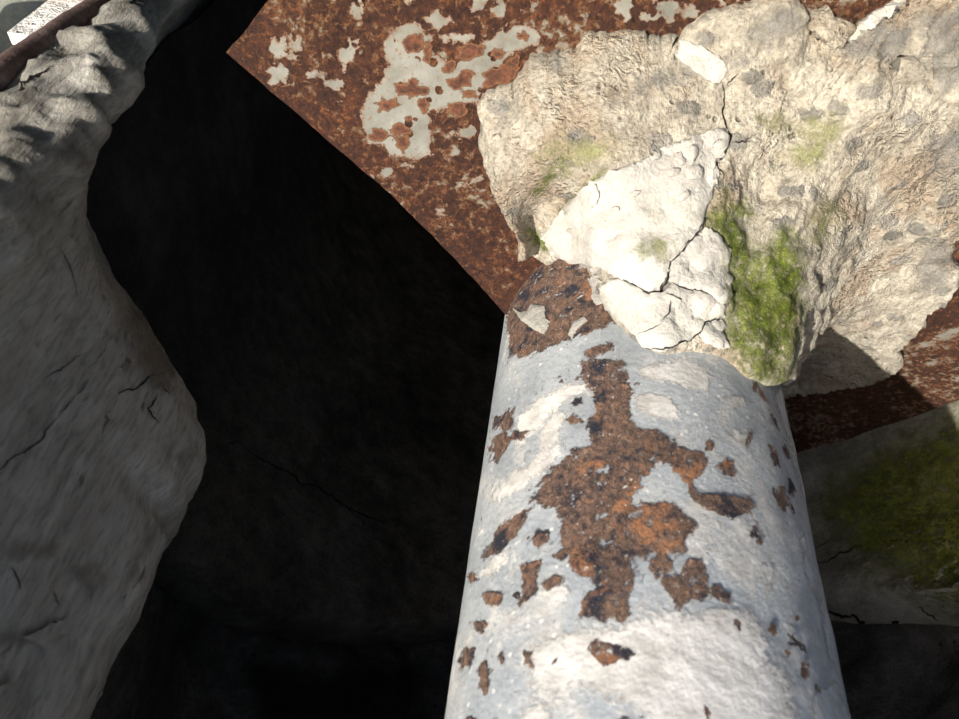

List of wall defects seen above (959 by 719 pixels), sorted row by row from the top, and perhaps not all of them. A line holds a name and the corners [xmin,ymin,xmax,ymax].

peeling [613,0,701,27]
spalling [808,0,906,49]
spalling [675,39,727,83]
spalling [541,127,733,352]
crack [609,218,720,350]
peeling [513,304,550,335]
rust [504,259,616,359]
rust [467,342,764,623]
rust [469,621,487,635]
crack [828,611,865,624]
rust [457,647,505,695]
rust [587,639,636,667]